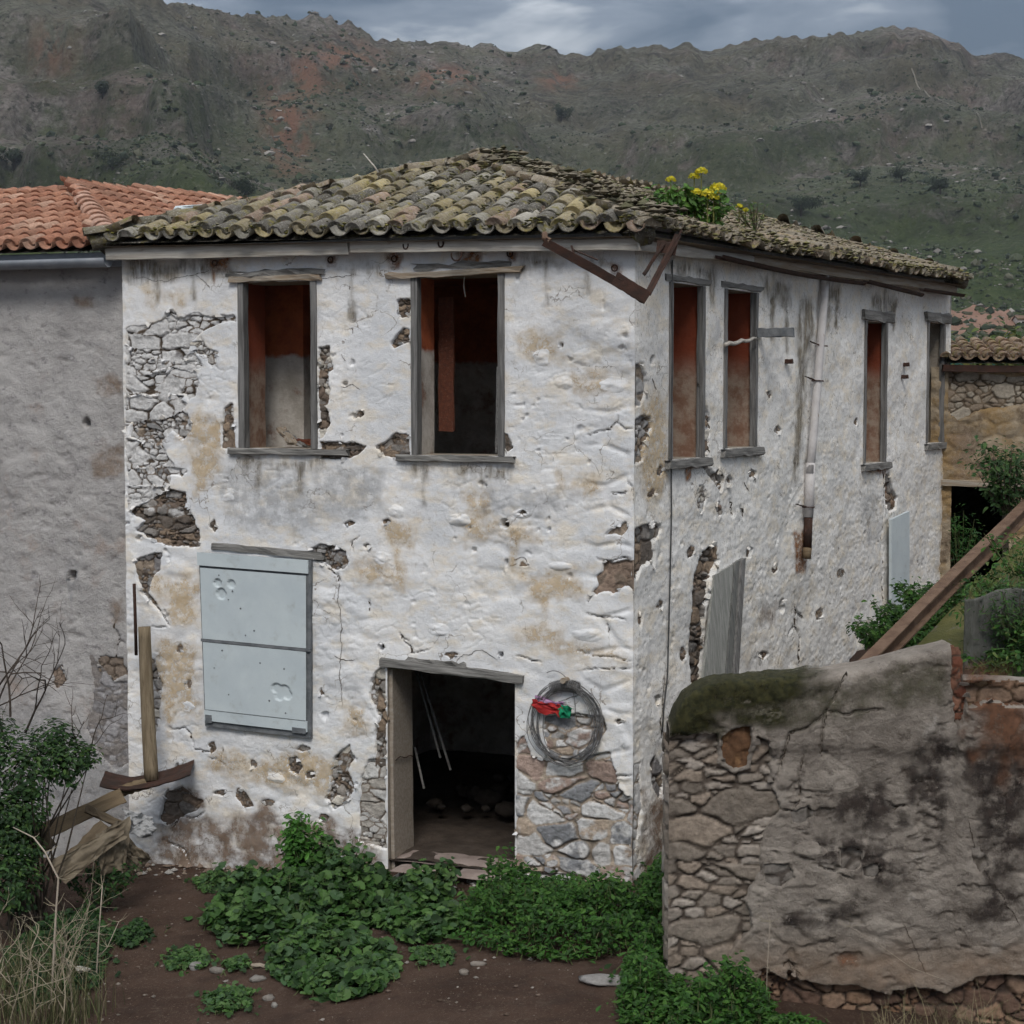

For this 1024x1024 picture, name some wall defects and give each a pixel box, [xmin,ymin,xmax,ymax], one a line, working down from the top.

spalling [122,309,236,610]
spalling [317,345,411,463]
damp [766,280,814,472]
spalling [588,520,659,596]
spalling [680,541,719,682]
spalling [318,668,390,848]
spalling [512,713,813,987]
crack [771,671,880,811]
damp [816,838,909,885]
damp [833,783,907,830]
damp [904,737,950,825]
damp [963,744,1024,920]